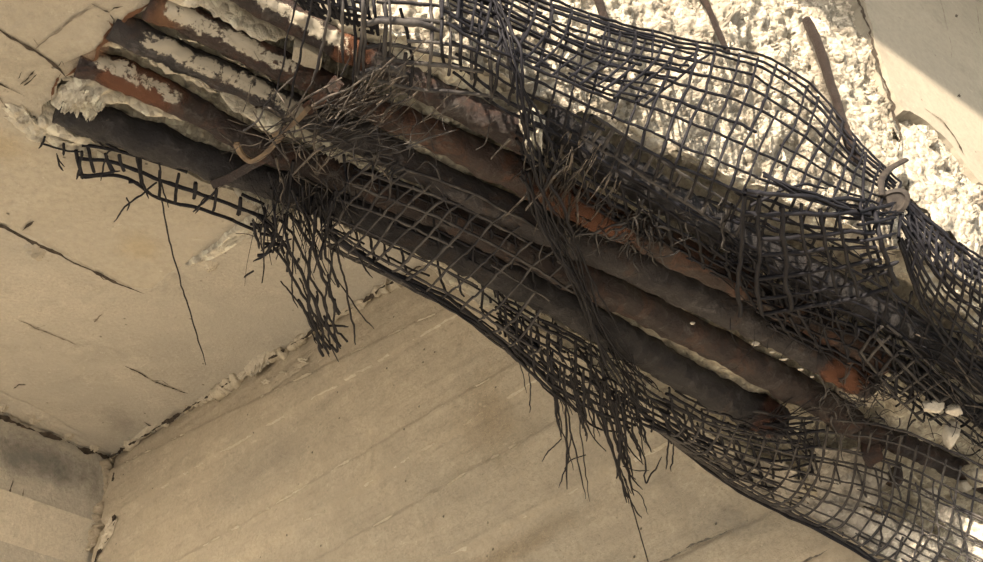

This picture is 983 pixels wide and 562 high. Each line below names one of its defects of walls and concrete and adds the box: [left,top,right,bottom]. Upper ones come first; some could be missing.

crack [0,4,148,99]
spalling [2,75,251,163]
rust [94,40,185,111]
rust [154,0,179,27]
spalling [169,0,295,54]
rust [330,31,373,69]
rust [528,176,633,242]
spalling [320,0,983,405]
crack [0,224,144,294]
crack [268,264,426,359]
spalling [395,246,861,499]
crack [0,366,241,481]